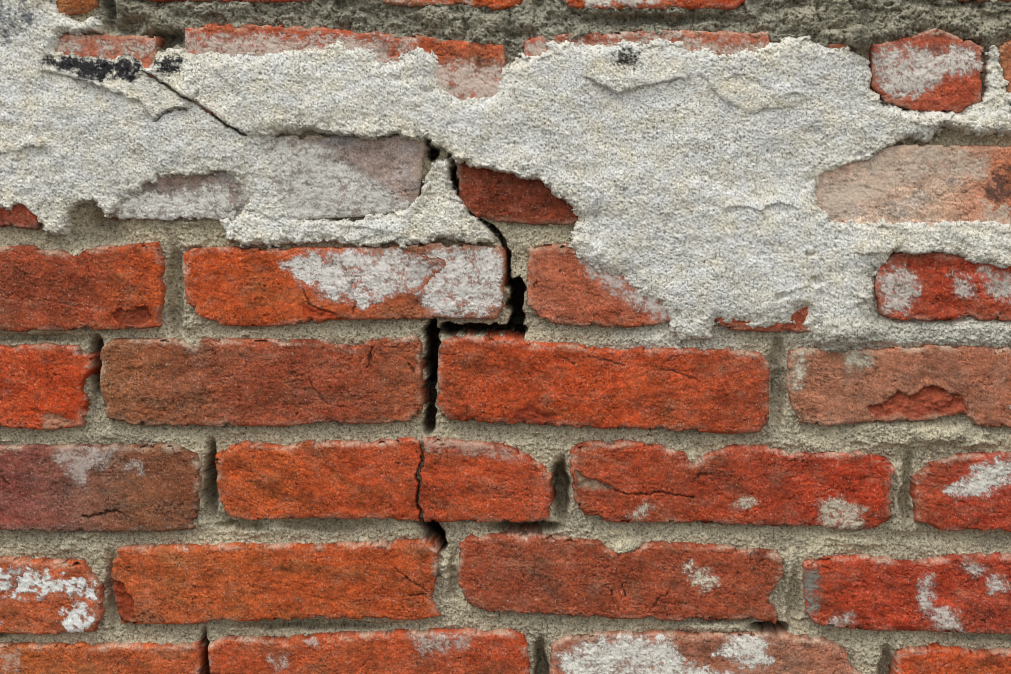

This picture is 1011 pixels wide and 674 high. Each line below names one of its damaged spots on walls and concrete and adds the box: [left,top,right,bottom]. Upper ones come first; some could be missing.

peeling [585,54,690,92]
leakage [872,41,983,100]
peeling [40,52,452,150]
crack [430,149,459,192]
peeling [39,195,74,233]
peeling [406,169,483,243]
peeling [858,226,1011,265]
leakage [280,244,504,318]
crack [428,224,526,427]
leakage [943,456,1011,498]
crack [431,521,447,543]
leakage [555,633,775,674]